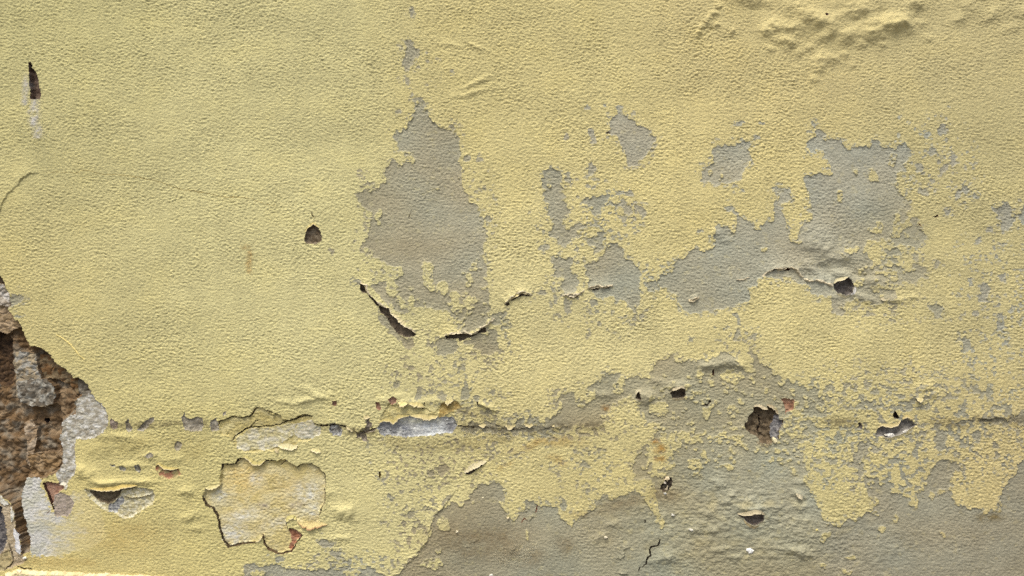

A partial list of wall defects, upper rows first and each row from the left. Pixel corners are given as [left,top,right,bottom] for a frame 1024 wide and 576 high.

crack [360,283,416,337]
crack [445,327,487,342]
crack [505,292,532,306]
peeling [174,36,1024,576]
flaking render [0,276,155,573]